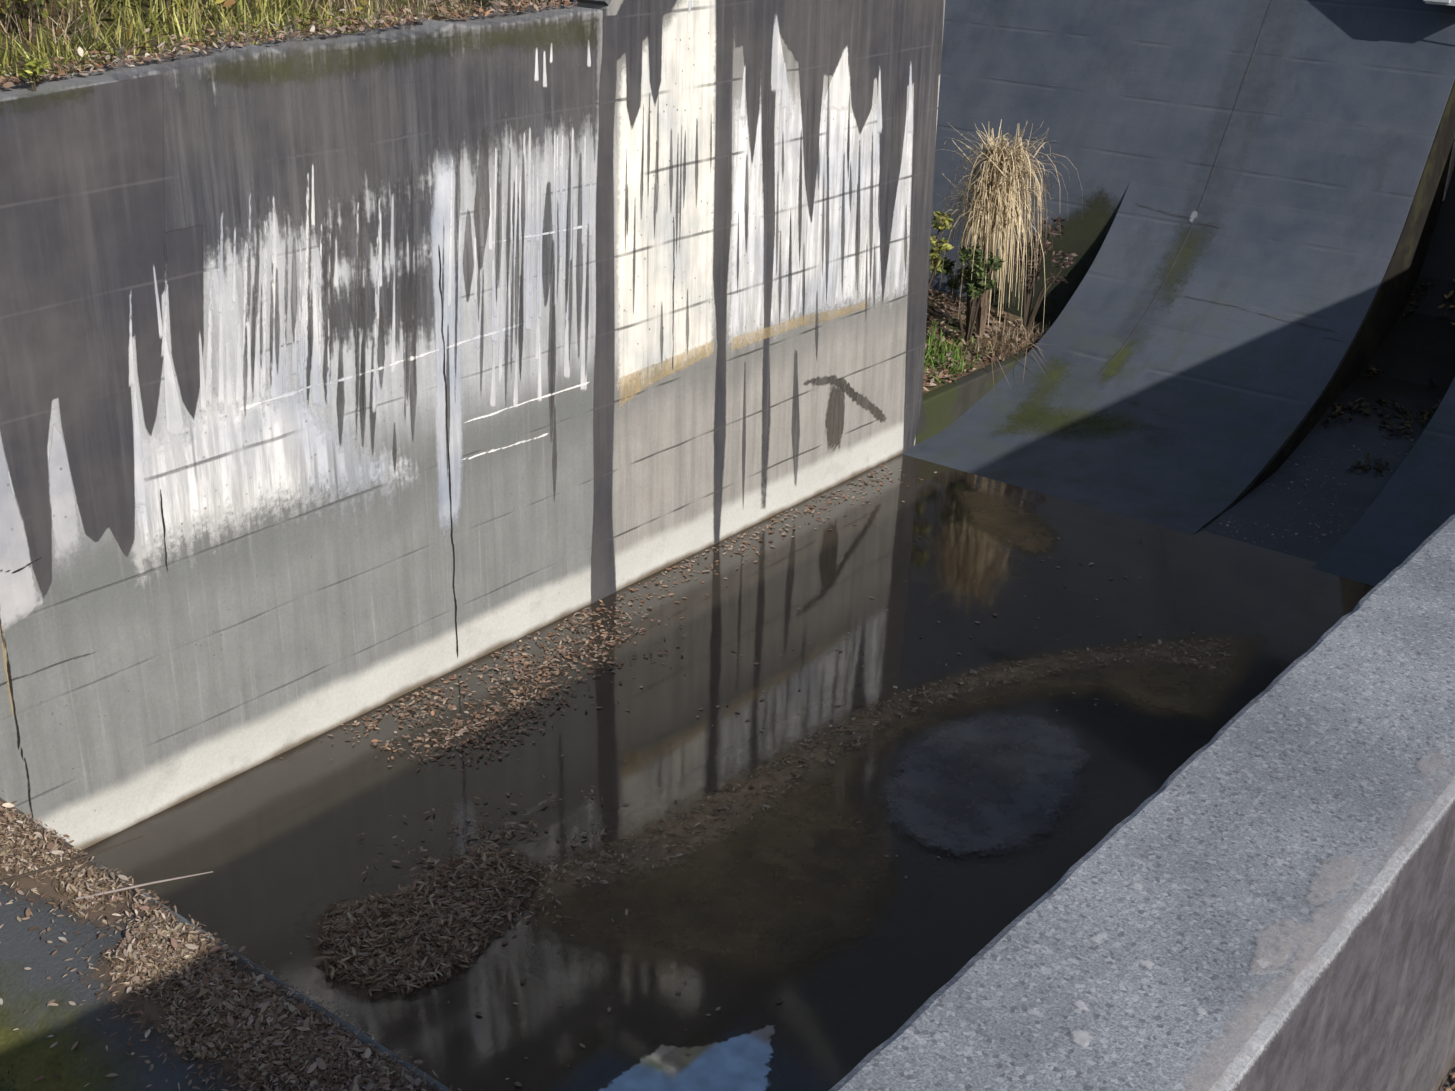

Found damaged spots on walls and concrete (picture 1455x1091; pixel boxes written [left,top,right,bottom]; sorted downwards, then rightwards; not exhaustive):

crack [438,246,458,658]
leakage [0,0,944,632]
crack [0,620,33,819]